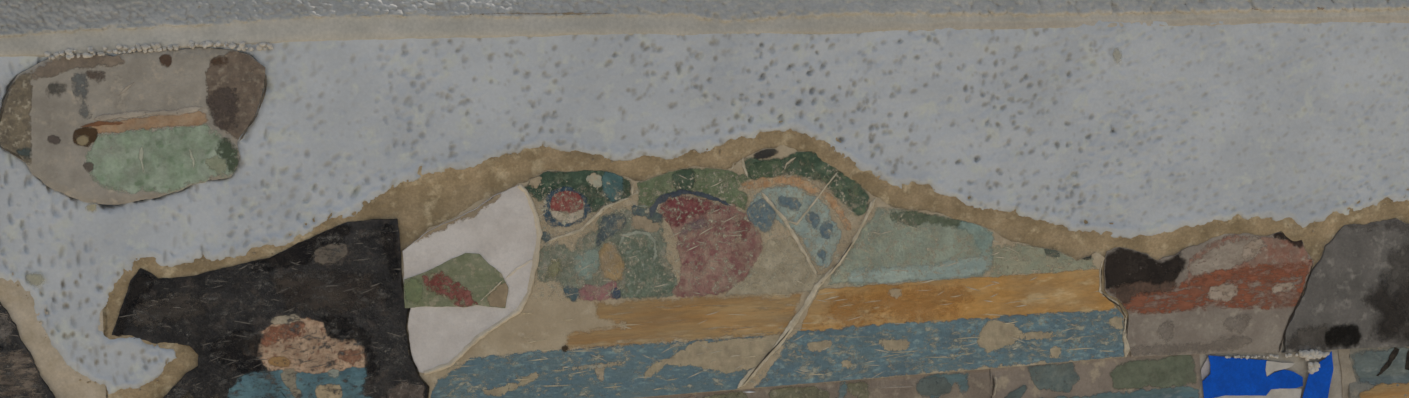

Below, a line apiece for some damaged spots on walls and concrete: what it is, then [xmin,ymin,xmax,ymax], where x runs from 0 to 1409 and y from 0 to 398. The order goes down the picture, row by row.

crack [737,173,876,388]